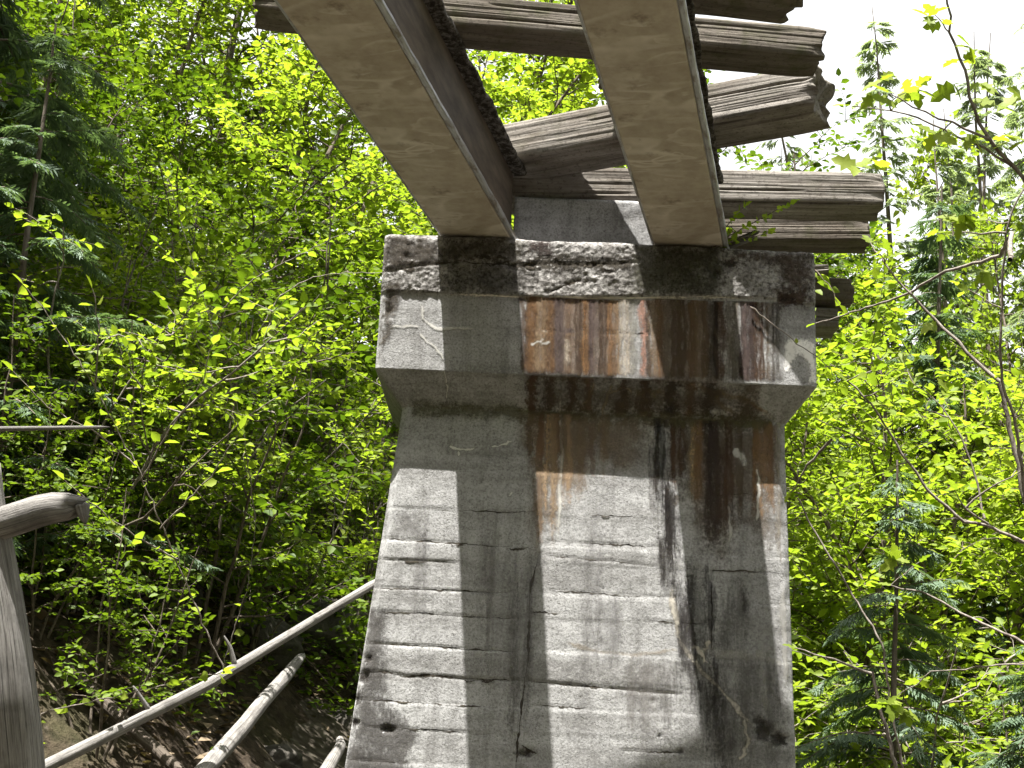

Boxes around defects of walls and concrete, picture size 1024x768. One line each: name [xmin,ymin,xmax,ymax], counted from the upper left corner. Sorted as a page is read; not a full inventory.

rust [519,296,778,553]
water stain [654,419,675,554]
water stain [733,448,761,519]
crack [373,538,782,762]
water stain [780,590,788,678]